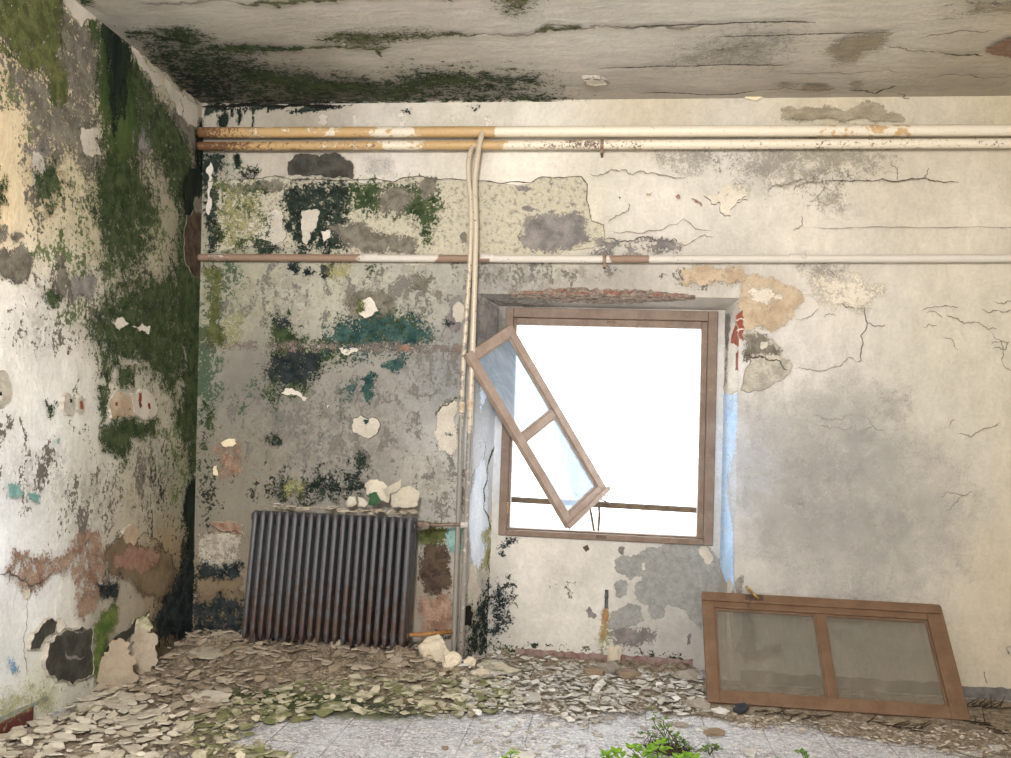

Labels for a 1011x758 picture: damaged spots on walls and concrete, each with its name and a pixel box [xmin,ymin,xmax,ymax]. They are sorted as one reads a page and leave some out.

crack [124,0,1009,99]
water stain [0,173,12,210]
water stain [25,147,74,221]
peeling [182,151,691,332]
crack [794,164,1011,230]
water stain [36,282,68,312]
water stain [76,23,596,658]
spalling [509,264,805,395]
crack [795,304,885,372]
crack [922,301,1011,371]
flaking render [0,524,178,686]
flaking render [607,543,720,648]